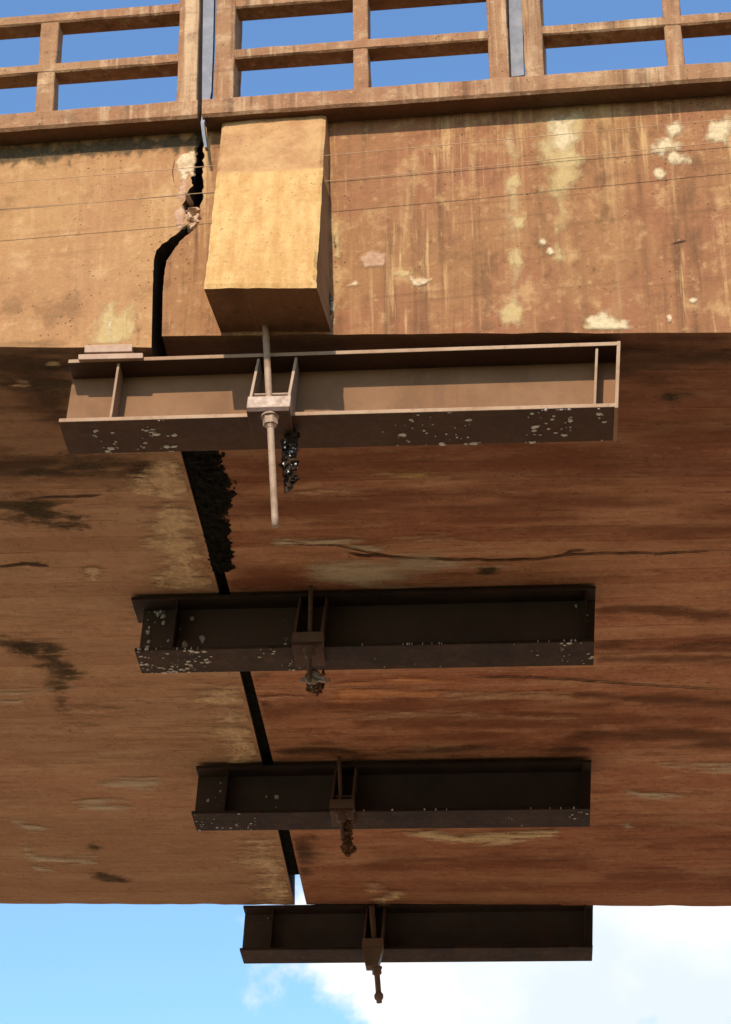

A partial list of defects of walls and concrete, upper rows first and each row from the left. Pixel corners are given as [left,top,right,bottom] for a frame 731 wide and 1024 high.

damp [541,113,583,195]
damp [652,122,698,179]
damp [706,120,731,143]
spalling [174,151,195,229]
damp [585,313,628,329]
damp [0,501,80,529]
spalling [130,460,213,590]
crack [271,544,731,562]
damp [0,641,79,702]